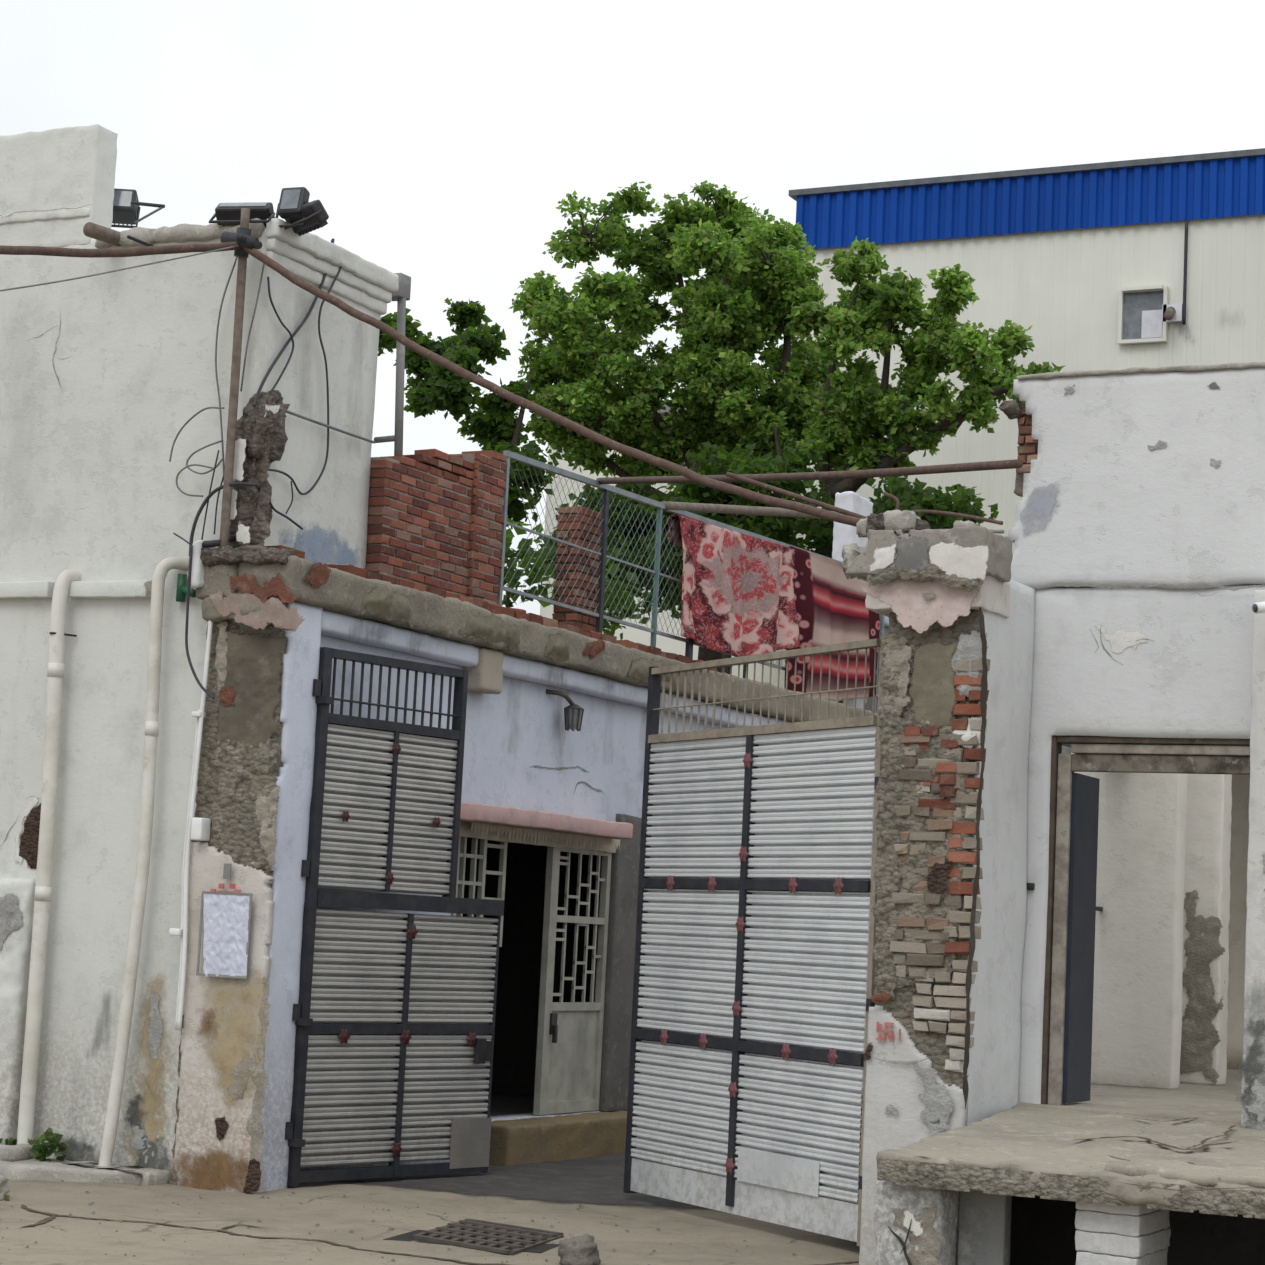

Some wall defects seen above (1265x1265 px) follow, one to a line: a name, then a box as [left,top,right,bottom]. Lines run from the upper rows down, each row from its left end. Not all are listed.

spalling [190,390,715,870]
spalling [1,796,41,869]
flaking render [838,536,991,1136]
leakage [127,982,171,1174]
leakage [199,977,263,1102]
spalling [1180,890,1225,1084]
leakage [1240,1021,1265,1130]
crack [21,1204,510,1265]
crack [814,1257,859,1265]
spalling [877,1158,1265,1219]
crack [1076,1117,1265,1191]